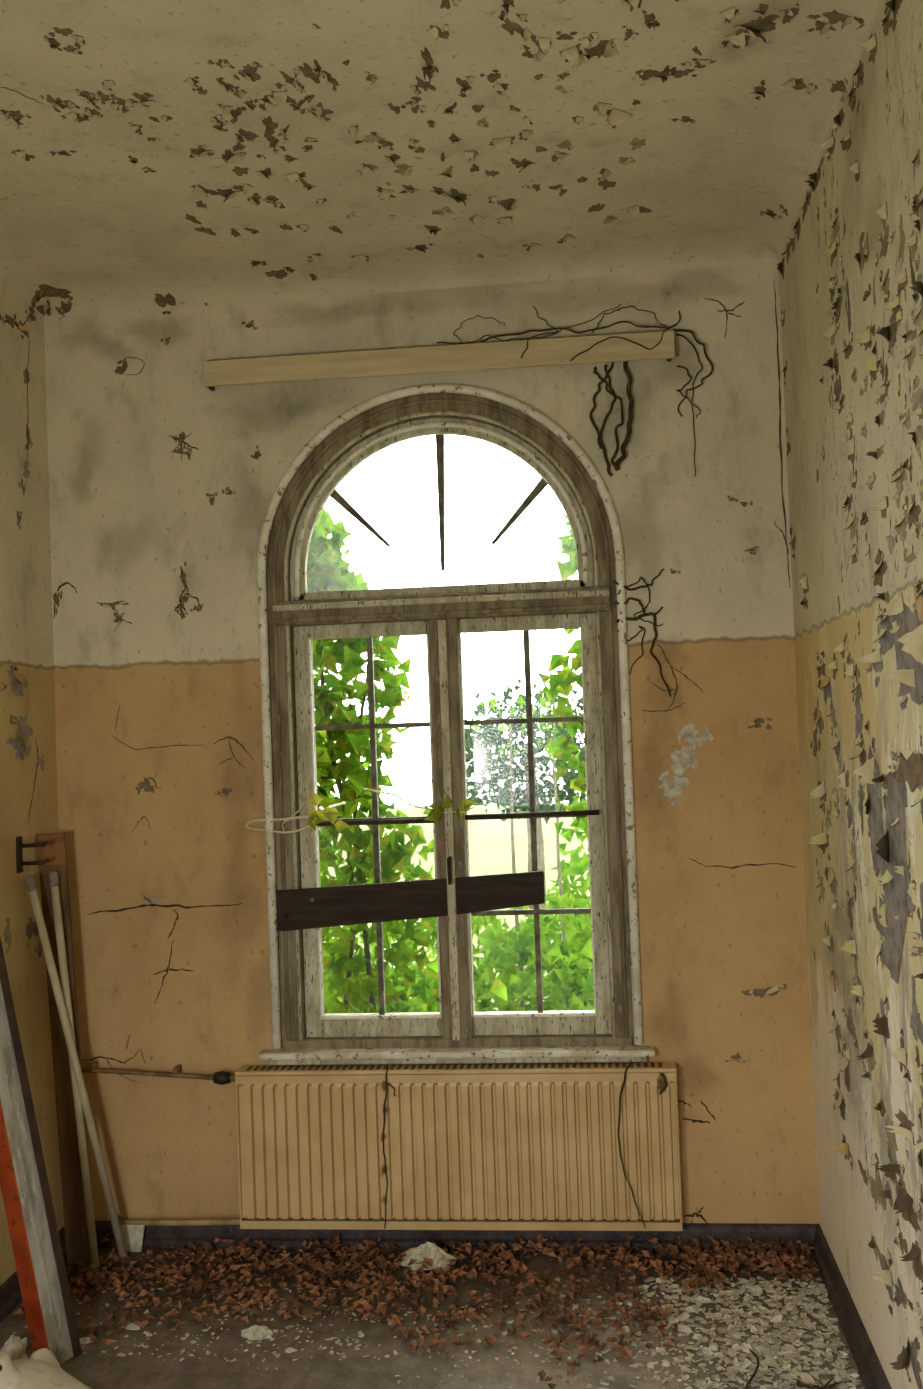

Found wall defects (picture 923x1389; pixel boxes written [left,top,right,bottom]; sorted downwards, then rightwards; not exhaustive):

peeling [43,27,85,55]
peeling [39,80,173,143]
peeling [184,59,350,237]
peeling [349,0,660,253]
peeling [251,253,323,281]
peeling [0,284,73,339]
peeling [154,293,186,315]
peeling [173,432,192,460]
peeling [176,562,203,619]
peeling [627,0,923,1389]
crack [689,858,795,869]
crack [89,895,242,1004]